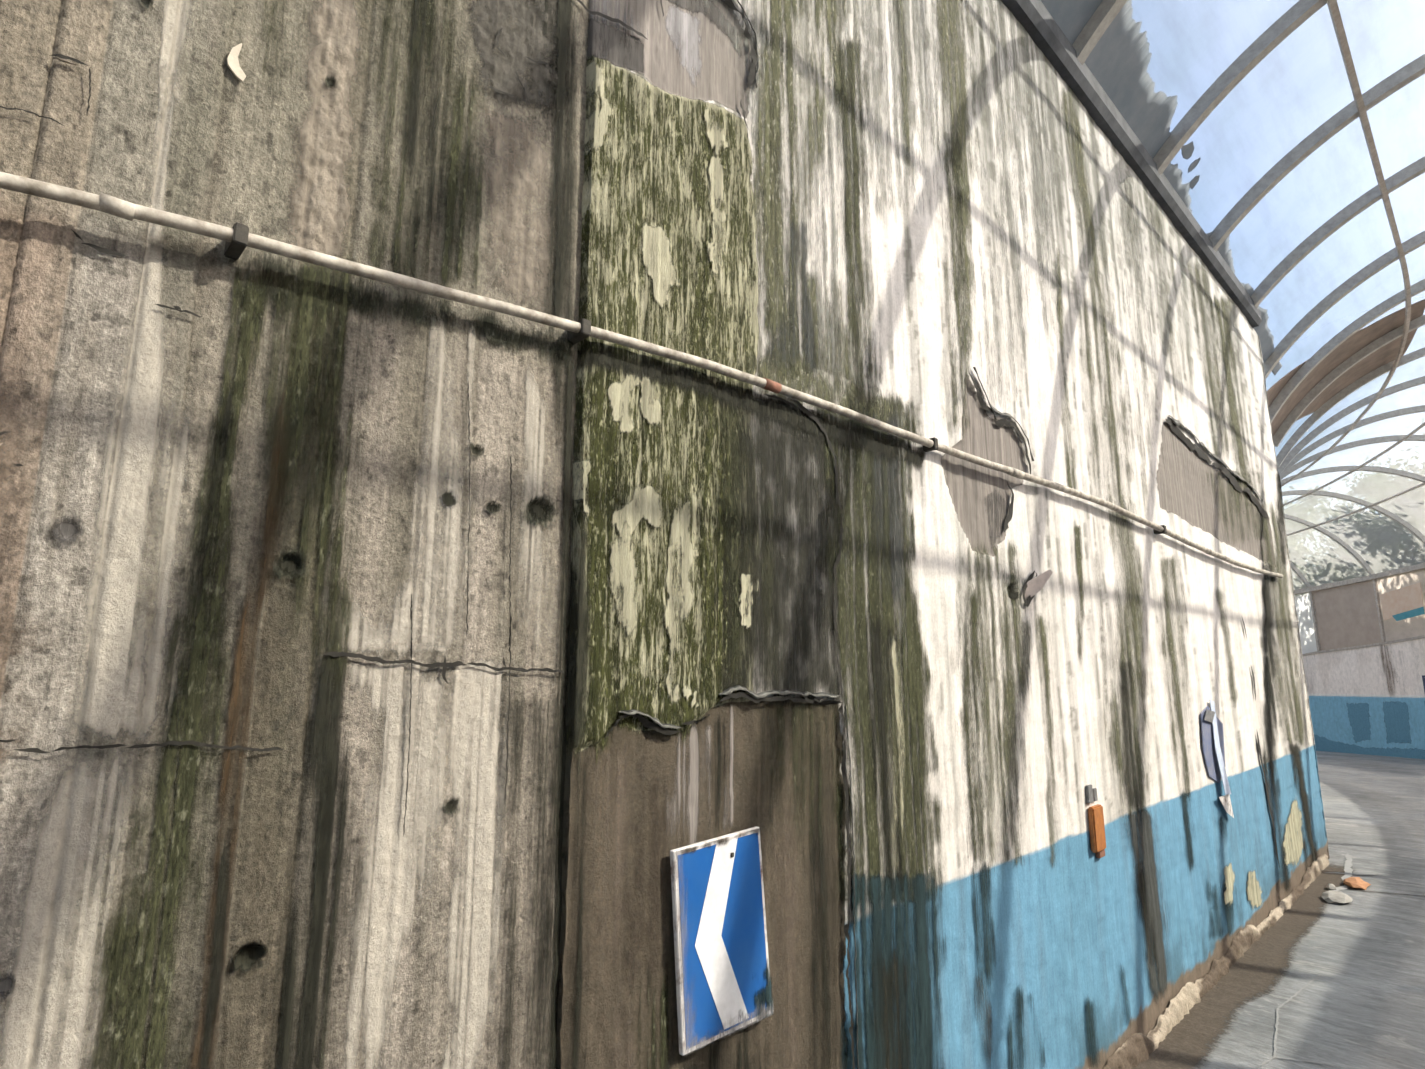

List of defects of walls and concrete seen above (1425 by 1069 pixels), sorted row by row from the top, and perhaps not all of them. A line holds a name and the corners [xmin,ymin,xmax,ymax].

crack [0,54,91,126]
leakage [0,756,131,1069]
crack [0,739,283,753]
leakage [74,0,219,738]
leakage [197,394,233,606]
peeling [0,0,847,1069]
crack [323,381,566,836]
leakage [247,0,1250,1069]
peeling [941,375,1026,556]
peeling [1156,422,1276,567]
flaking render [1103,799,1329,1069]
leakage [1133,473,1354,1069]